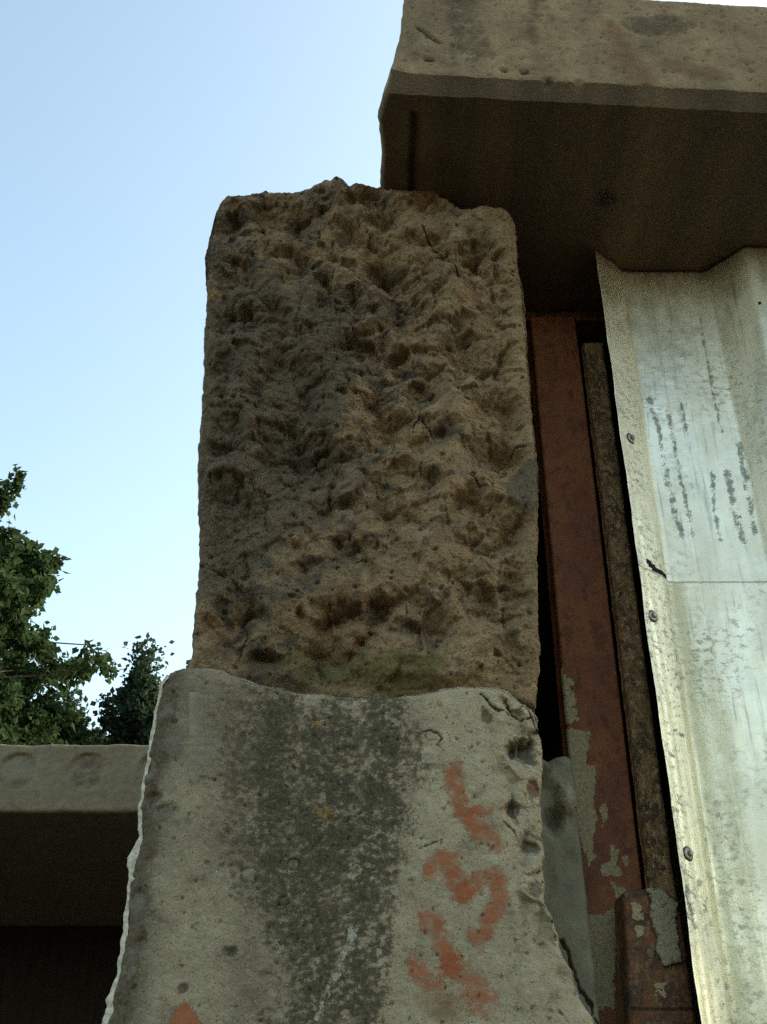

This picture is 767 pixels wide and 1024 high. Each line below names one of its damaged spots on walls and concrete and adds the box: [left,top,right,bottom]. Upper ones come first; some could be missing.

damp [206,685,430,1024]
crack [480,694,535,727]
peeling [561,668,644,1011]
peeling [654,982,667,998]